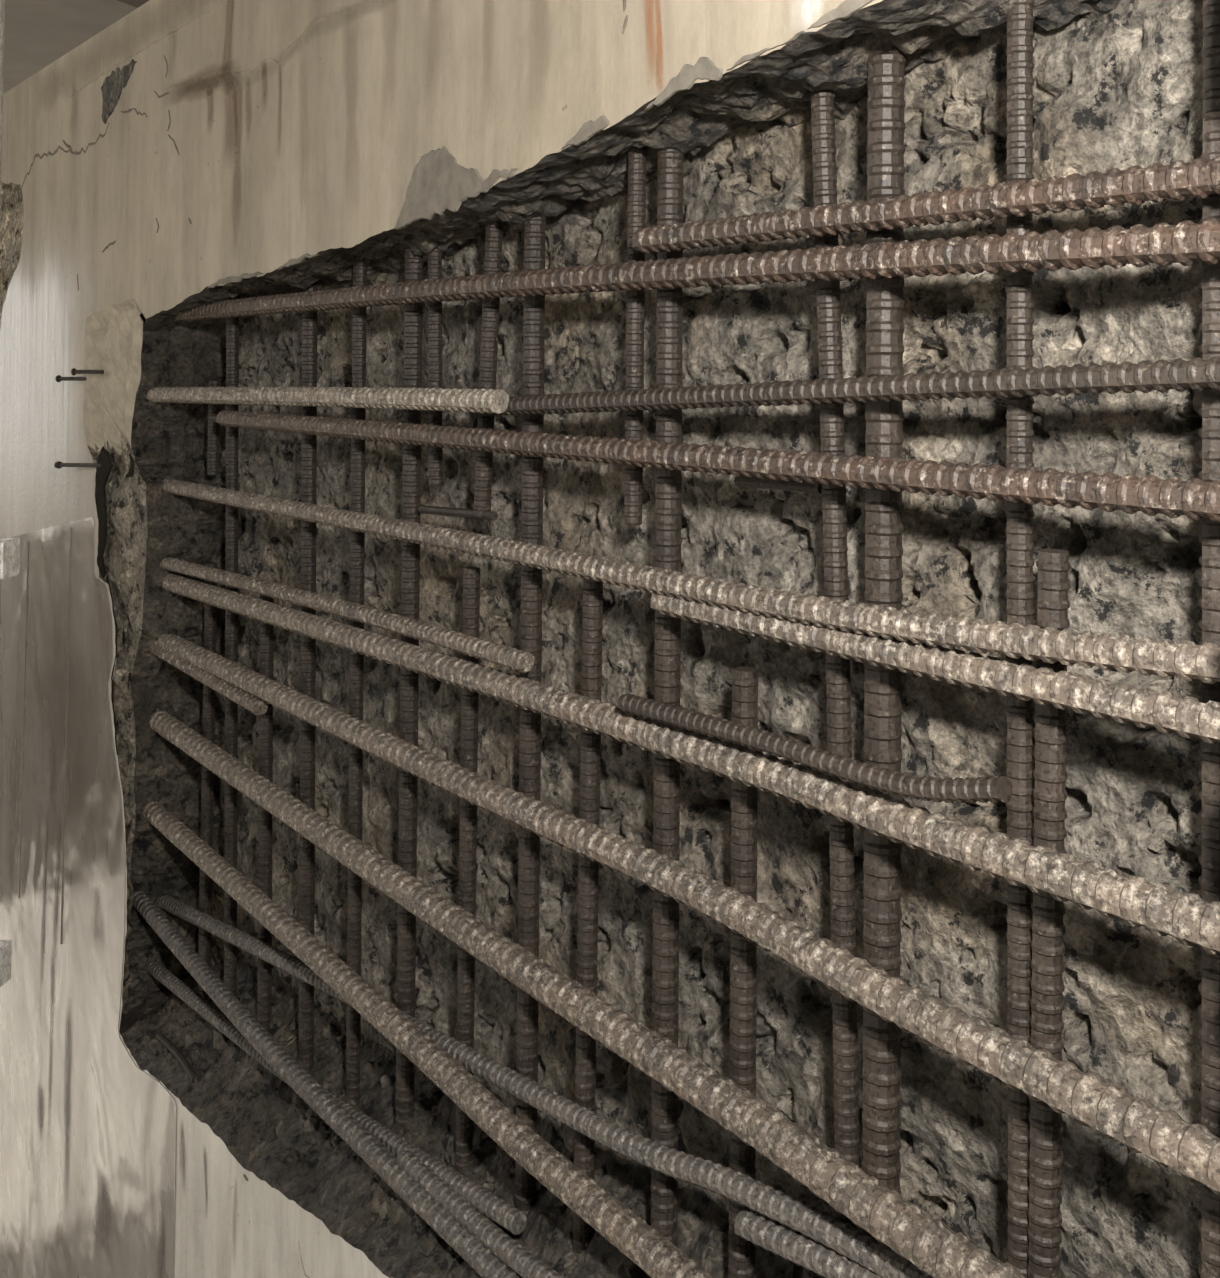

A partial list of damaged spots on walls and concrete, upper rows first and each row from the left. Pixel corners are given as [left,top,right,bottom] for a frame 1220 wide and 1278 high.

crack [22,55,179,187]
corrosion [648,0,661,77]
spalling [1199,0,1220,160]
spalling [682,280,819,387]
spalling [1033,261,1203,369]
spalling [477,356,1220,483]
spalling [902,490,1007,623]
spalling [1033,502,1202,645]
spalling [618,592,1220,903]
spalling [1062,900,1202,1124]
spalling [900,1031,1008,1263]
spalling [1059,1113,1202,1278]